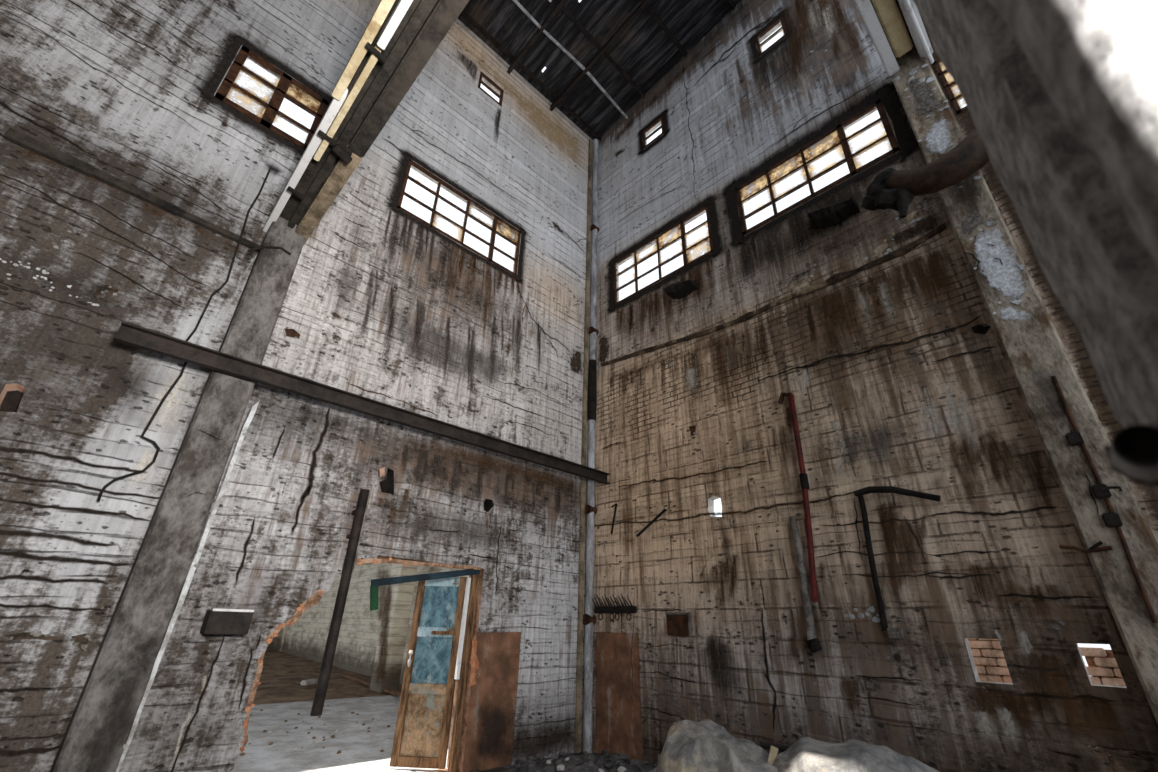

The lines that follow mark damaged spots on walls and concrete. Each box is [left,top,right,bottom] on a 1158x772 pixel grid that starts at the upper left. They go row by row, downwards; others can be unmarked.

damp [385,211,451,278]
damp [363,271,378,330]
damp [386,290,522,389]
crack [292,408,330,532]
crack [235,518,255,584]
spalling [356,557,480,570]
crack [171,636,224,772]
spalling [240,589,325,752]
damp [702,637,740,692]
crack [761,611,777,730]